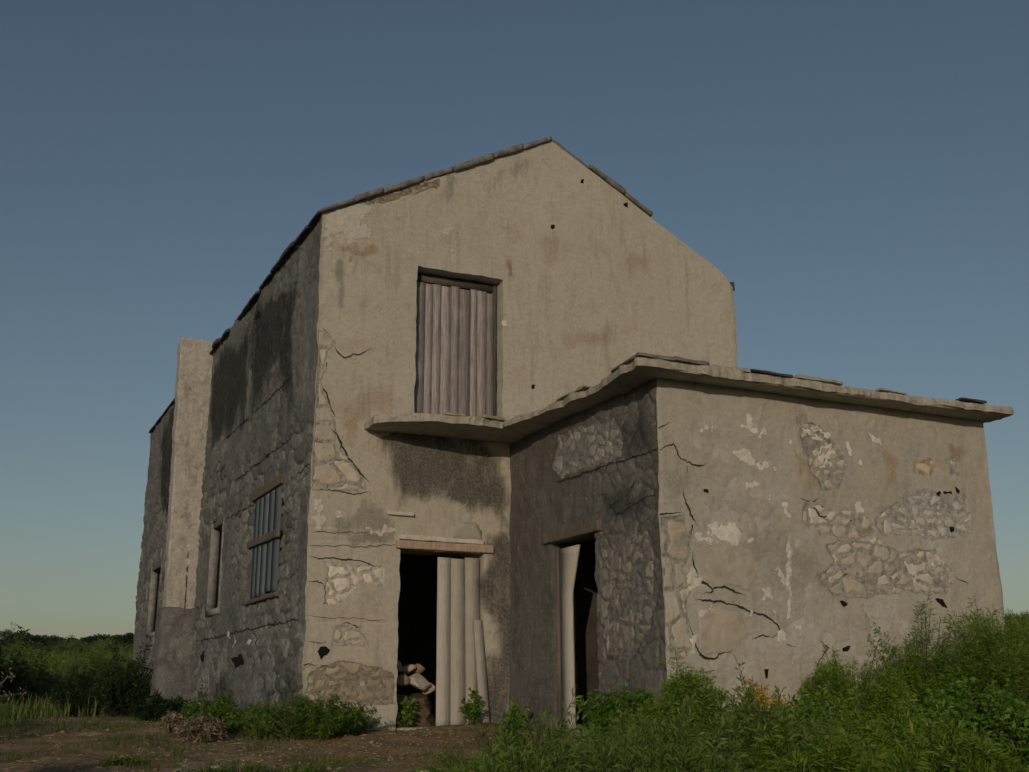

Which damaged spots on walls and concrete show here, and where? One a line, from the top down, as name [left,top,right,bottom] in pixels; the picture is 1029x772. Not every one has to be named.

flaking render [322,179,440,251]
leakage [161,405,175,512]
leakage [211,291,295,446]
crack [296,329,370,495]
spalling [306,660,396,706]
leakage [383,432,506,514]
leakage [479,534,511,723]
spalling [553,417,624,478]
crack [554,422,795,647]
spalling [600,515,754,662]
crack [690,626,725,660]
spalling [767,457,972,599]